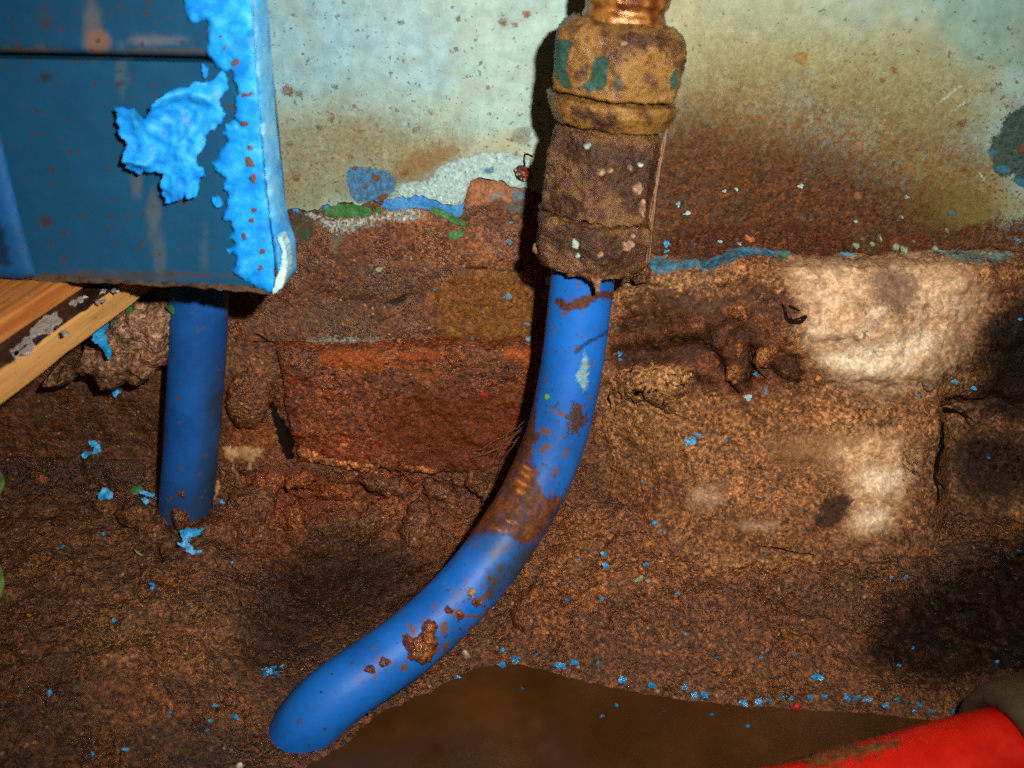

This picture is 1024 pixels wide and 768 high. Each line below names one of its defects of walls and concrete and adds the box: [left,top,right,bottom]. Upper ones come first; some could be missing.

peeling [115,0,298,304]
crack [933,407,974,506]
leakage [812,496,854,532]